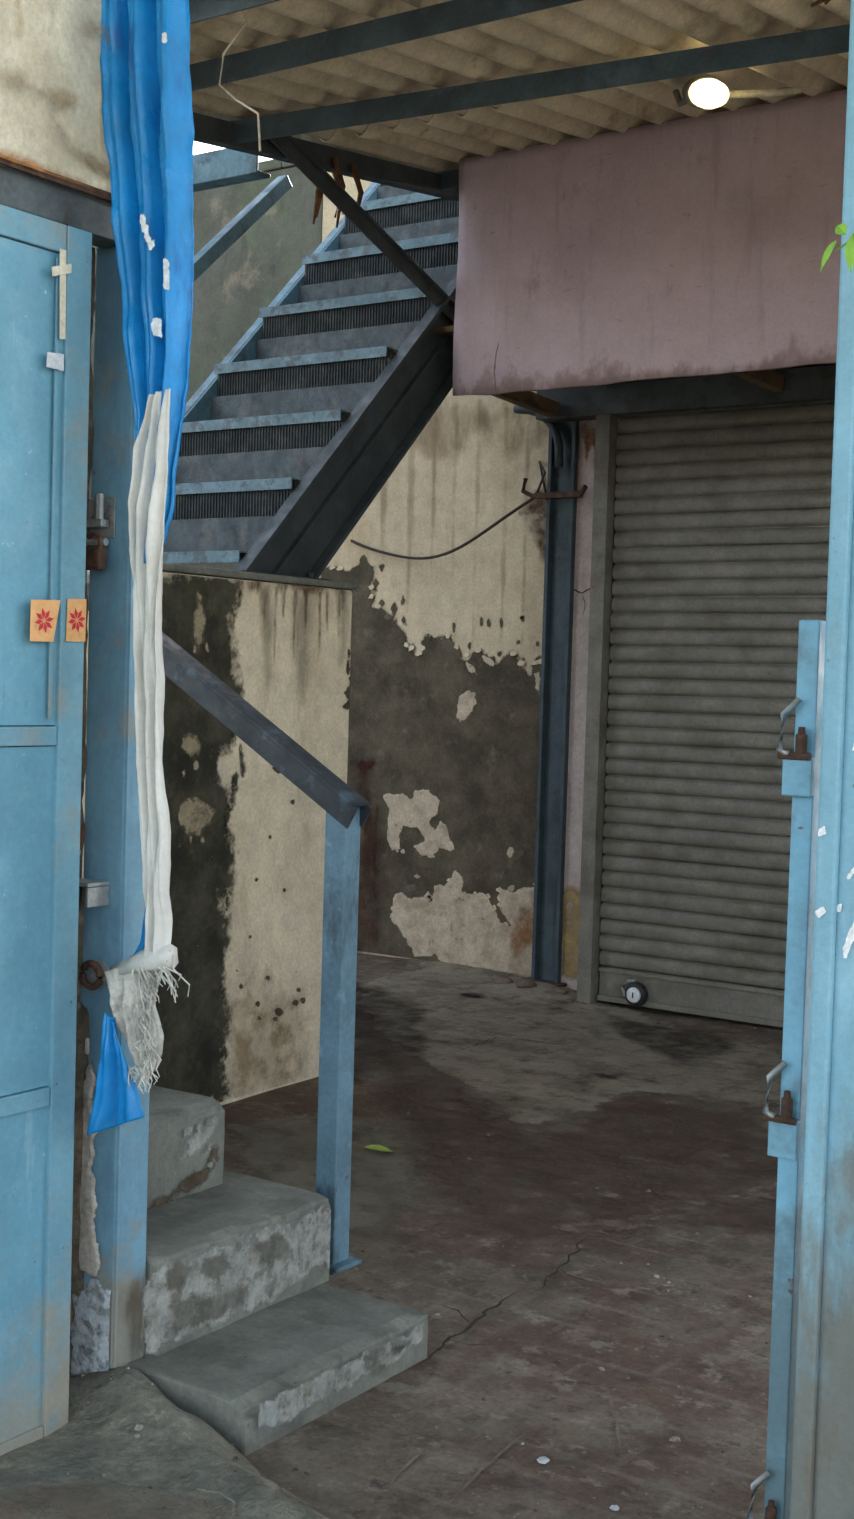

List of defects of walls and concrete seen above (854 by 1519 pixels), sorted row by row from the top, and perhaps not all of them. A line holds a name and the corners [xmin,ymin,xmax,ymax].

leakage [162,574,244,697]
spalling [321,555,542,976]
leakage [150,676,246,1102]
peeling [815,904,854,959]
crack [419,1236,590,1364]